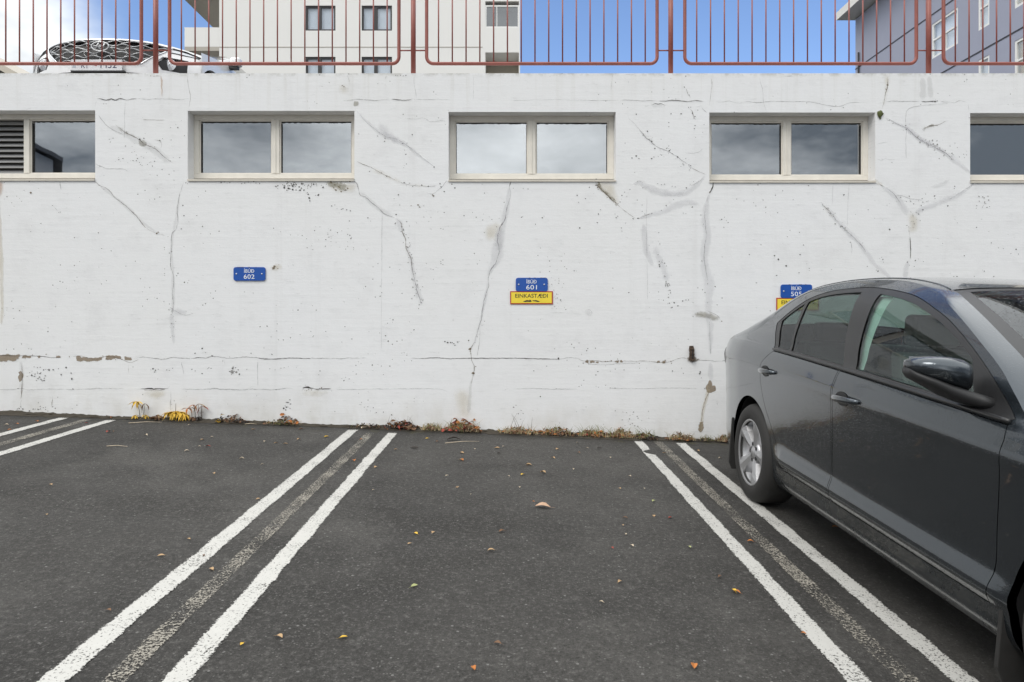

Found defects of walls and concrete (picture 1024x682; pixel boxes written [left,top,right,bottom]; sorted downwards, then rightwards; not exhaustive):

crack [98,91,190,159]
crack [98,165,345,368]
crack [346,75,455,309]
crack [418,182,572,374]
crack [634,82,970,287]